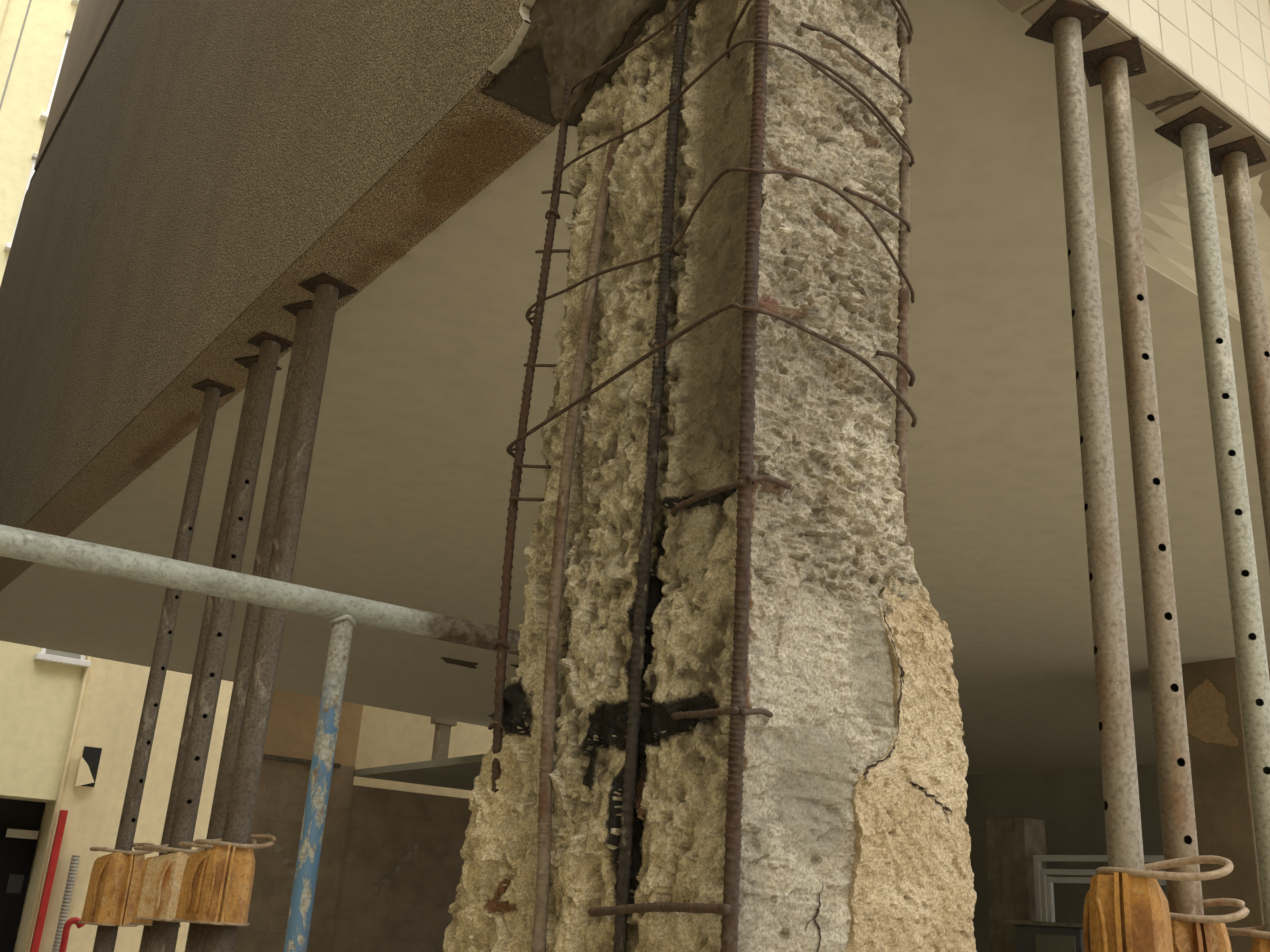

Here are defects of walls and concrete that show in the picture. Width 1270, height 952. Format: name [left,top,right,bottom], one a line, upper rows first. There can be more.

peeling [488,0,535,74]
spalling [816,34,882,83]
spalling [837,107,882,149]
spalling [763,150,802,181]
spalling [814,211,849,255]
spalling [661,488,736,509]
spalling [441,657,478,669]
damp [489,676,532,737]
crack [863,611,905,780]
peeling [1185,679,1239,747]
crack [910,782,953,825]
corrosion [484,877,517,913]